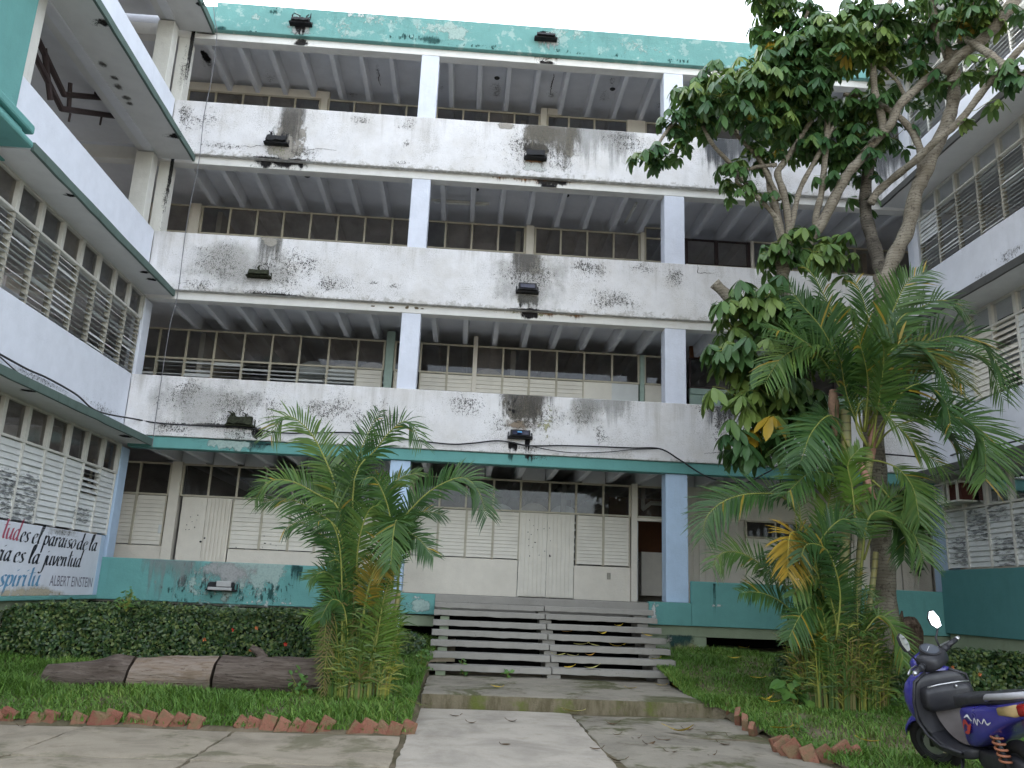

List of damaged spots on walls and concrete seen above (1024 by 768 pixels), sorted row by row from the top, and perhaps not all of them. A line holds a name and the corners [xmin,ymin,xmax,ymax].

peeling [415,21,468,40]
water stain [183,237,354,298]
water stain [574,261,640,310]
water stain [155,377,283,451]
water stain [307,396,411,438]
peeling [161,562,292,607]